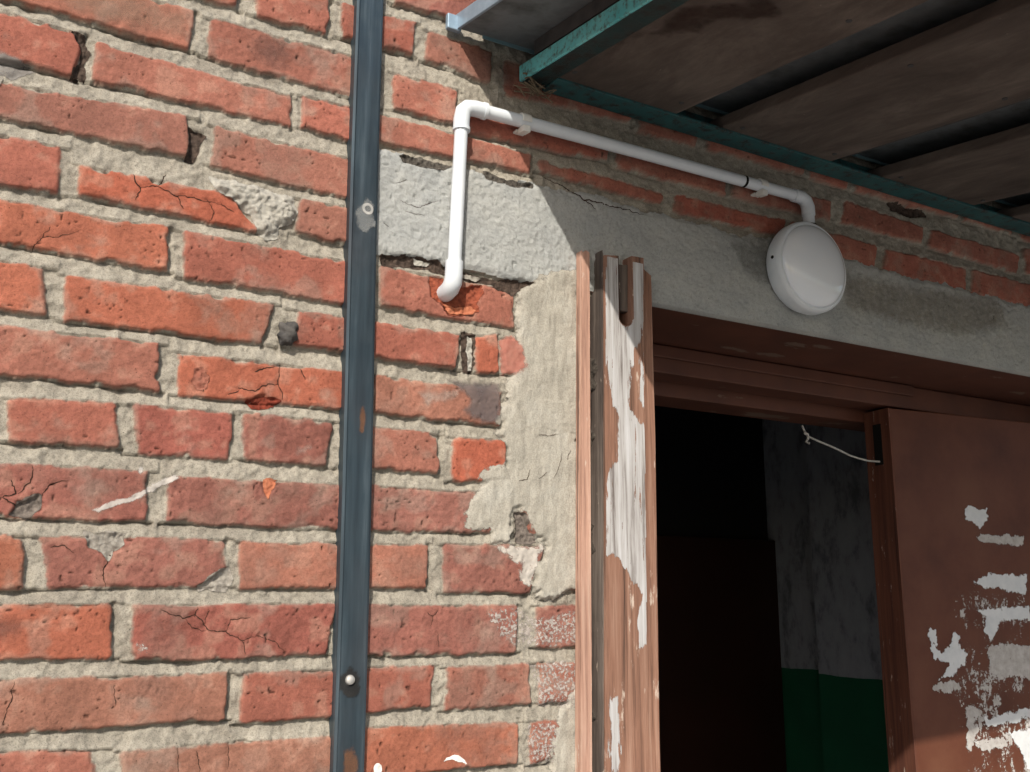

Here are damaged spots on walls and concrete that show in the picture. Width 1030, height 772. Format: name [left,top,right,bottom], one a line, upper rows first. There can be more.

crack [134,175,234,222]
crack [542,176,644,215]
peeling [379,254,576,602]
crack [0,466,65,505]
crack [162,609,281,654]